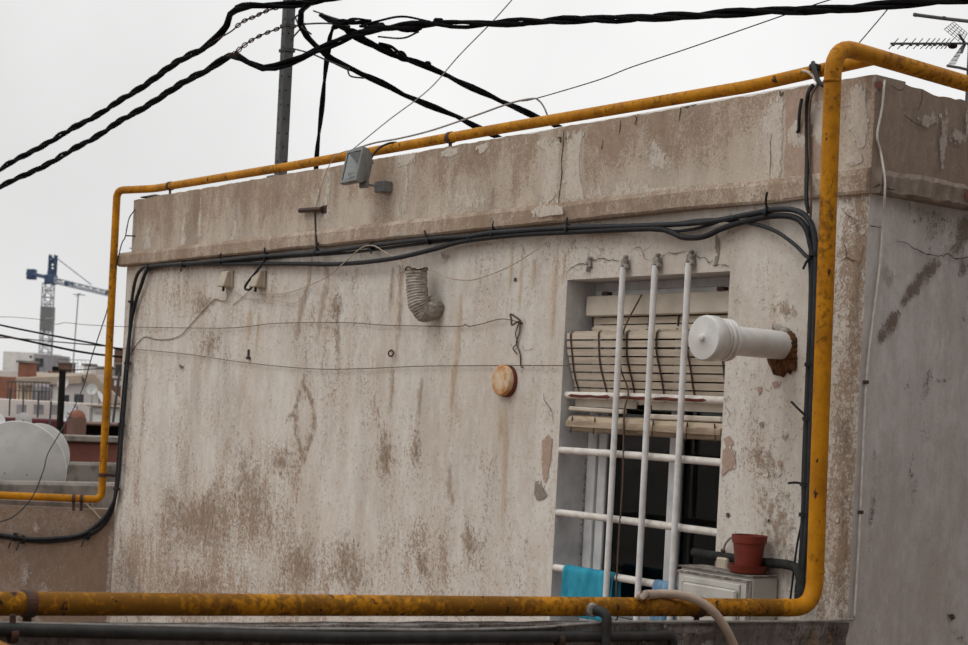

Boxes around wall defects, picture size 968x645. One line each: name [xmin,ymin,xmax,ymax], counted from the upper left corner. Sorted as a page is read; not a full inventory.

crack [549,130,564,203]
peeling [917,107,968,169]
spalling [531,202,563,217]
crack [841,211,968,261]
spalling [534,434,552,500]
peeling [721,421,798,560]